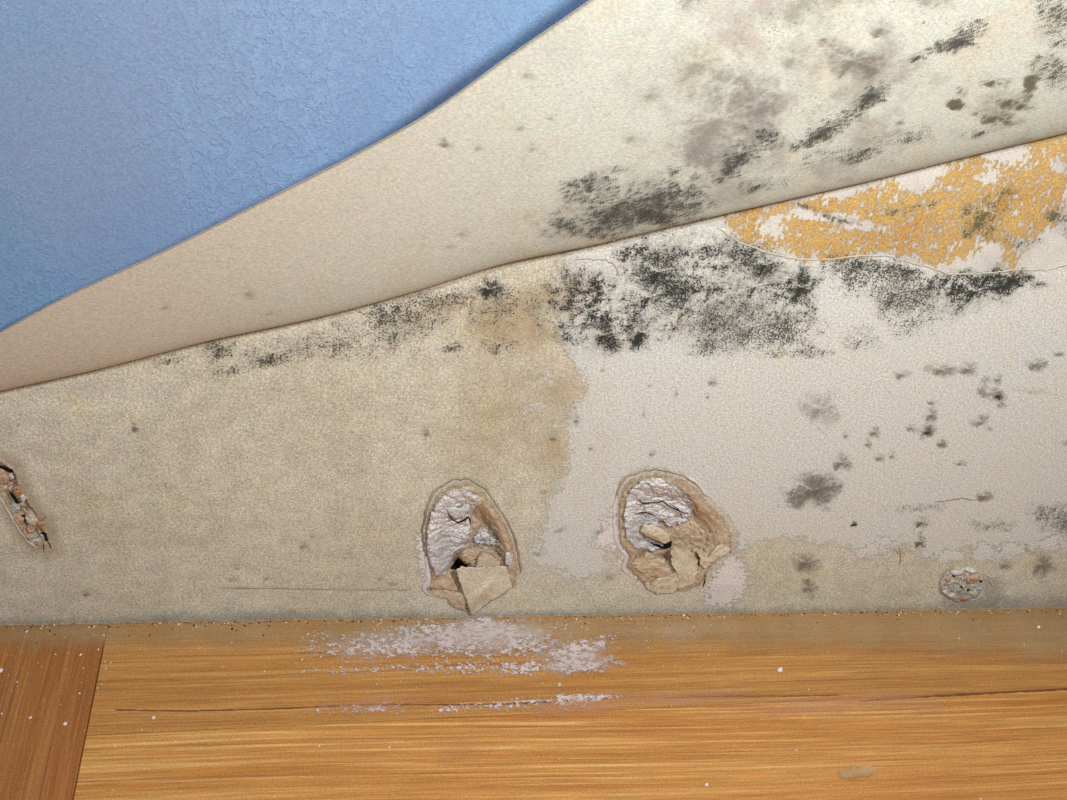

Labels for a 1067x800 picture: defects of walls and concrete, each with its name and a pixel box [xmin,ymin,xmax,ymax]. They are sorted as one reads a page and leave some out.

water stain [911,18,989,62]
water stain [962,0,1067,137]
water stain [204,38,1047,379]
peeling [0,0,1067,615]
water stain [907,402,947,448]
water stain [786,458,851,509]
water stain [1028,501,1067,534]